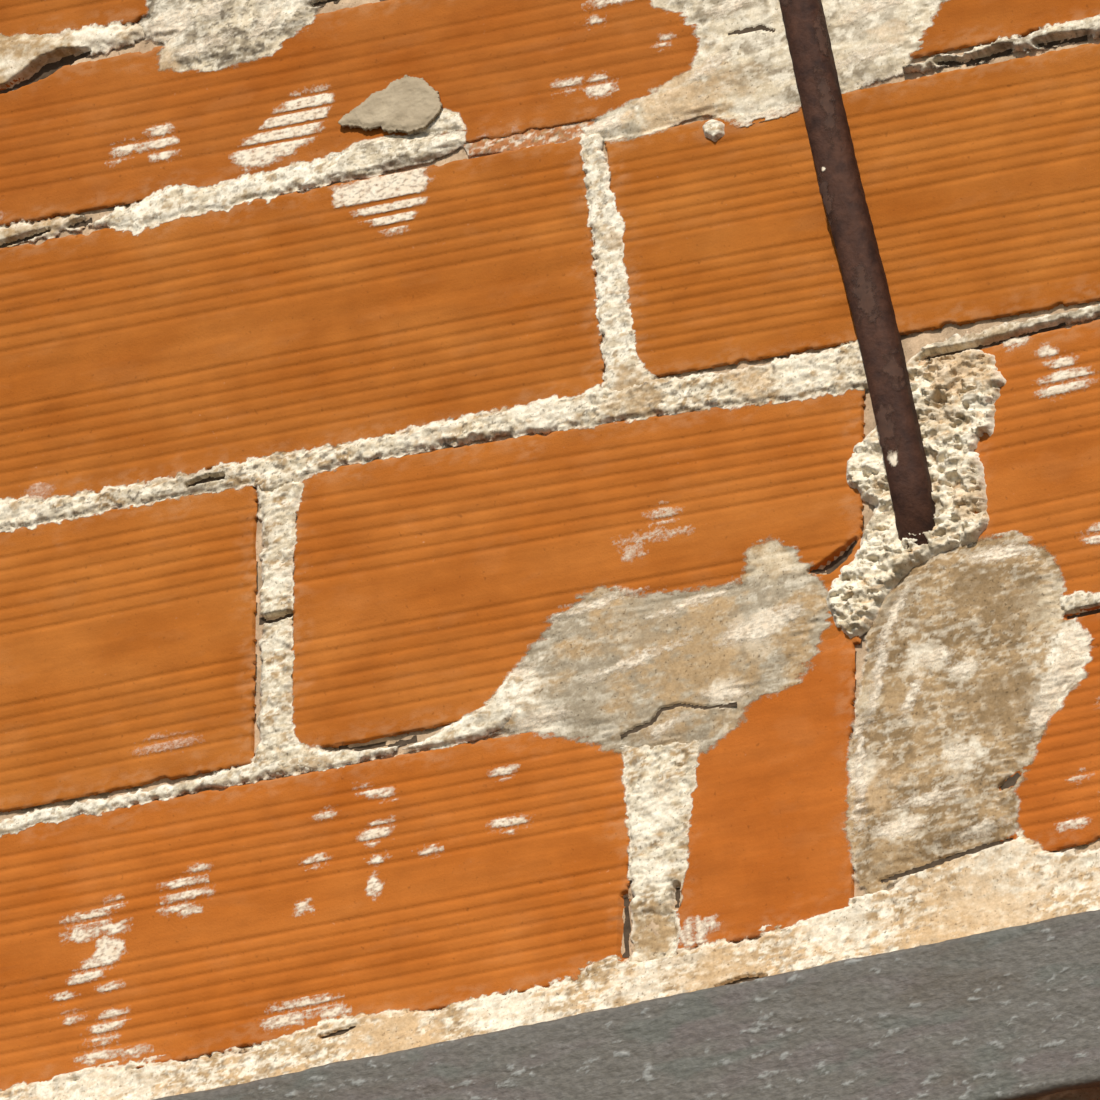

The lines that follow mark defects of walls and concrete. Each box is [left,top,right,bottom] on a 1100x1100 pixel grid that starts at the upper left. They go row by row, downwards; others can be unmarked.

crack [0,51,90,94]
crack [938,35,1087,68]
damp [113,124,178,162]
peeling [231,89,333,171]
peeling [326,75,467,233]
rust [818,173,837,226]
rust [852,264,882,323]
damp [1037,345,1092,397]
rust [872,403,899,453]
spalling [810,349,1006,638]
crack [620,702,737,738]
damp [55,896,126,1000]